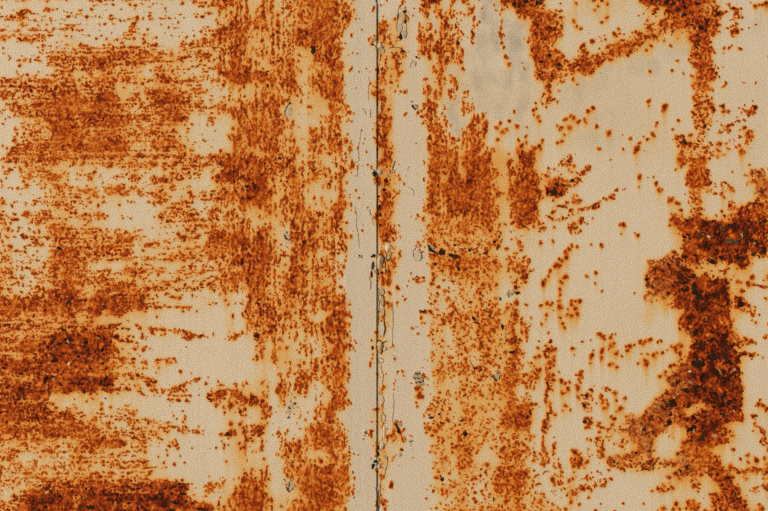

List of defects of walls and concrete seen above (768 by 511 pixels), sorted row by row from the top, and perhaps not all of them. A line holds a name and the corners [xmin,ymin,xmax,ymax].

peeling [396,5,407,40]
corrosion [0,0,300,511]
corrosion [202,0,768,511]
peeling [378,287,394,342]
spalling [413,371,424,386]